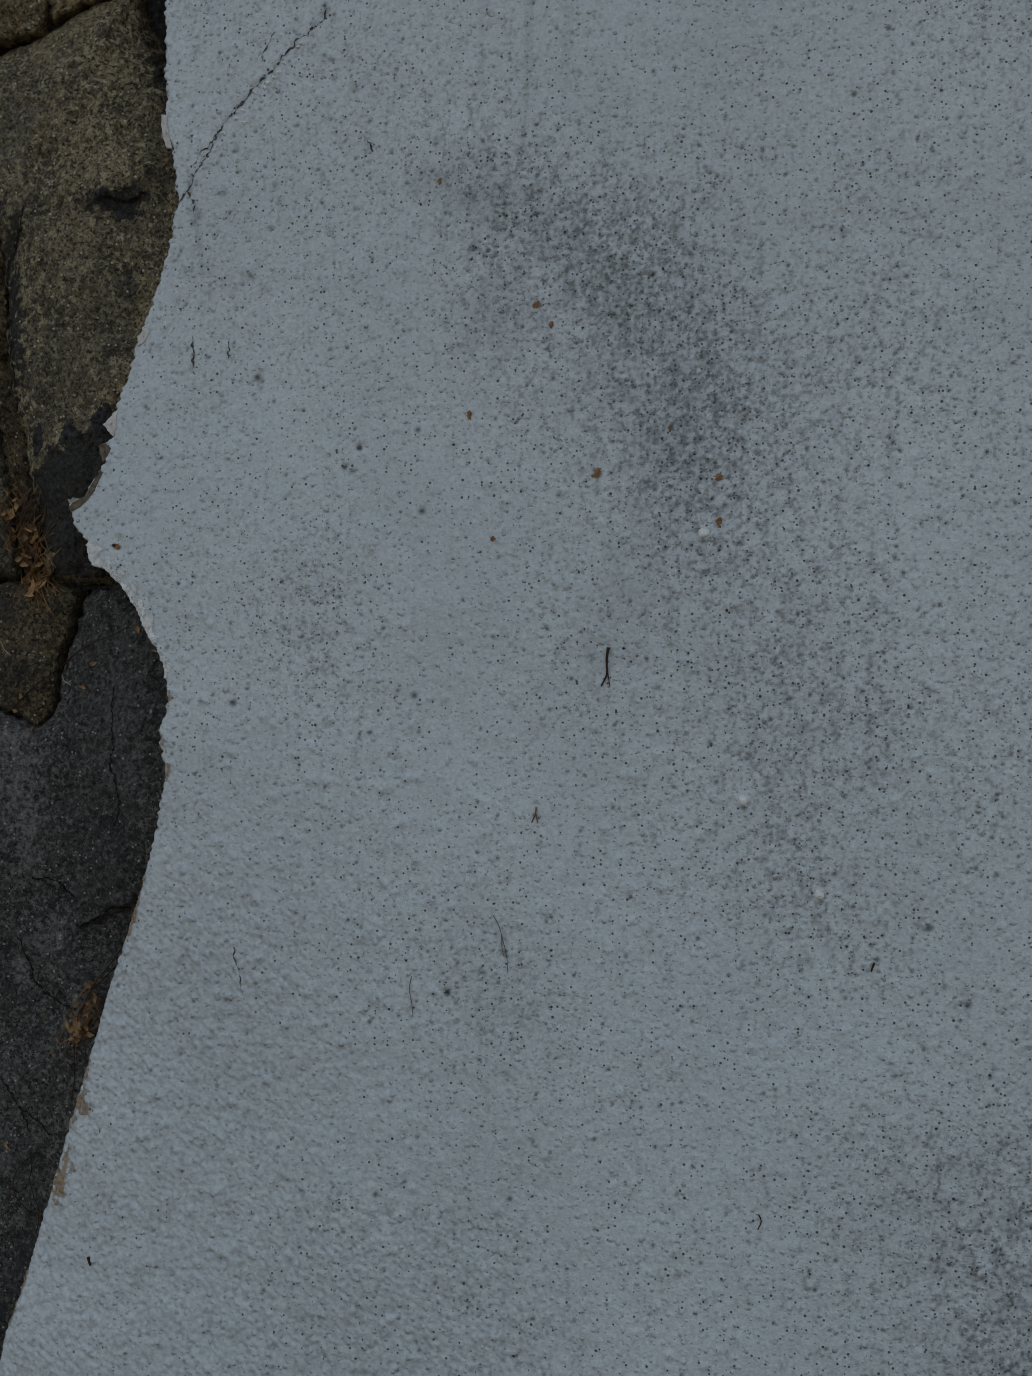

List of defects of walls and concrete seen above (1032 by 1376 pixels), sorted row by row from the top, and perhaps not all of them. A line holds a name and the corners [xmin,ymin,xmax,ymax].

crack [179,5,326,213]